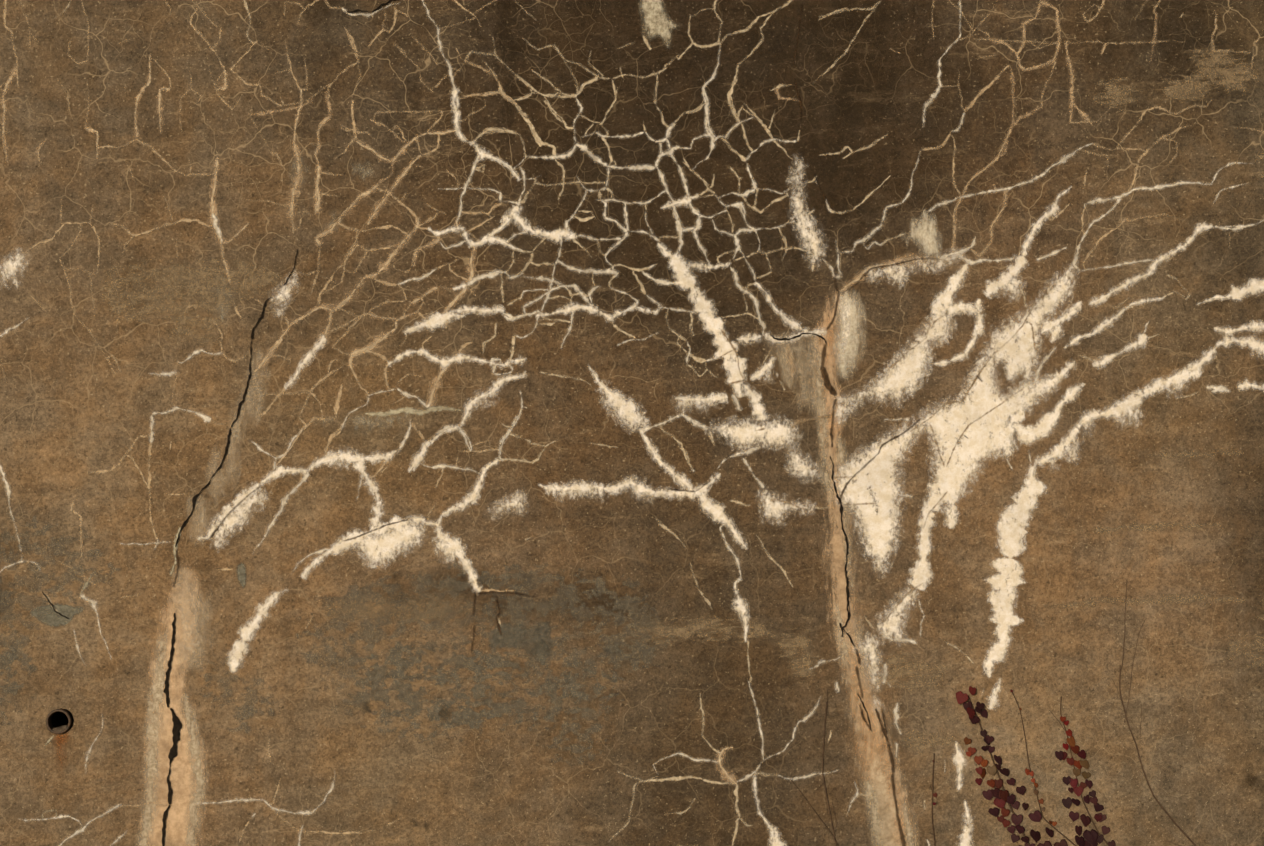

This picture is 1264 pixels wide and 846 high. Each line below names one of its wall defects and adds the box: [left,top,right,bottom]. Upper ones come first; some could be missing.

efflorescence [642,0,676,50]
crack [32,57,248,265]
efflorescence [791,163,824,271]
crack [1021,106,1264,512]
efflorescence [1198,279,1264,304]
crack [97,0,1093,846]
efflorescence [580,367,649,429]
efflorescence [657,243,1084,709]
efflorescence [1207,380,1264,393]
crack [70,504,108,654]
crack [25,613,182,846]
efflorescence [953,743,973,846]